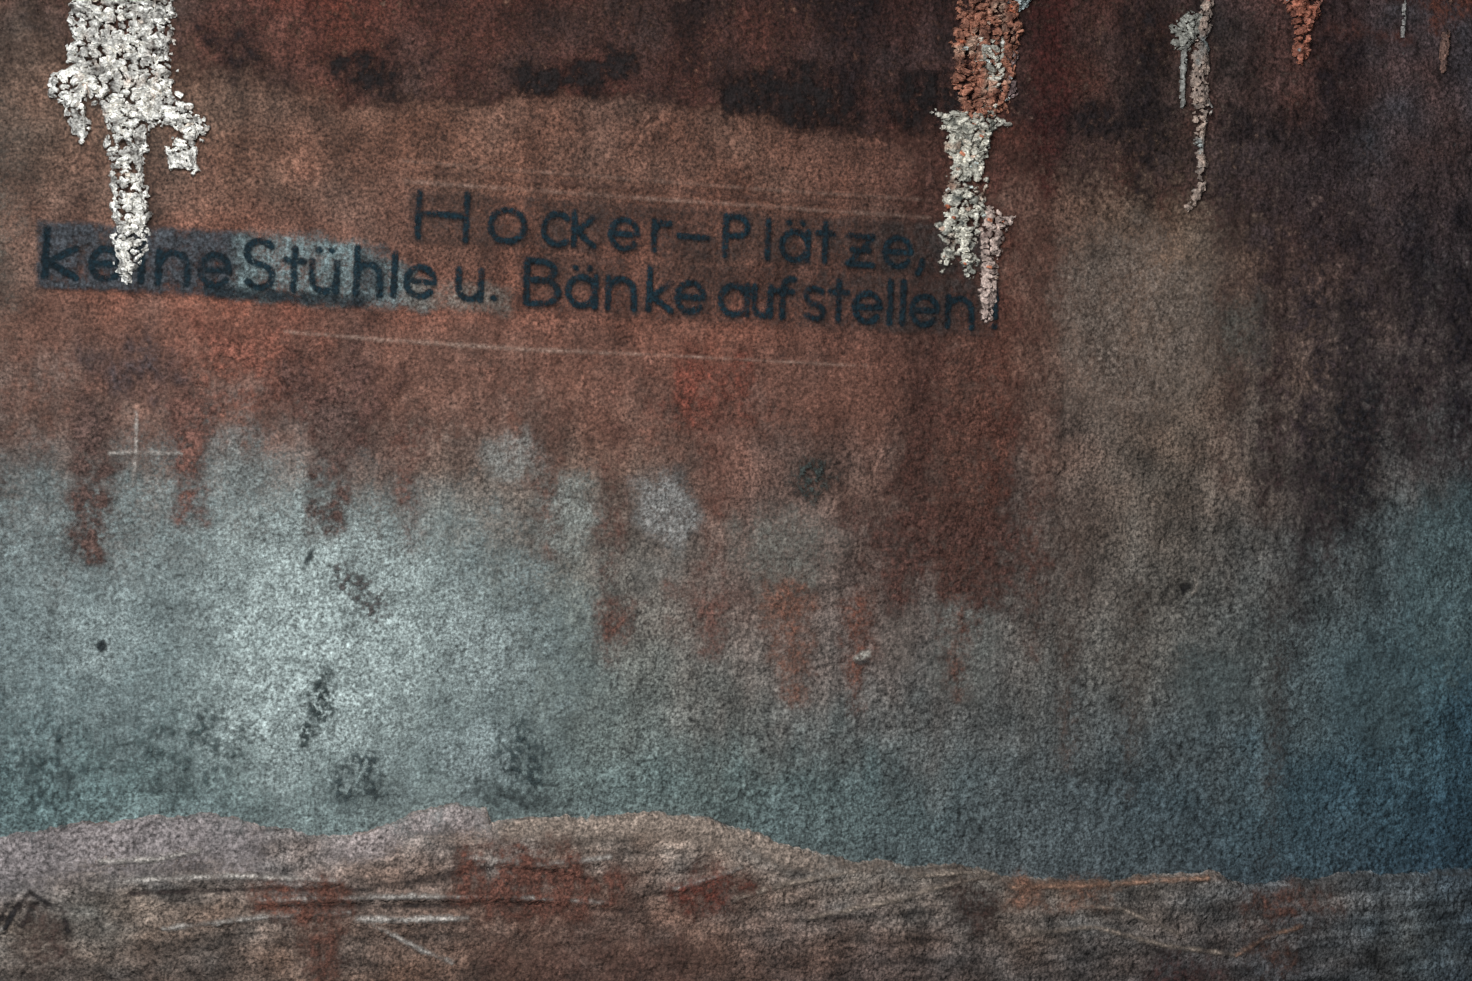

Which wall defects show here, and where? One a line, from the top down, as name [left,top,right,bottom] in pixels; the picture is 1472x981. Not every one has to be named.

water stain [0,0,1472,543]
water stain [333,561,391,622]